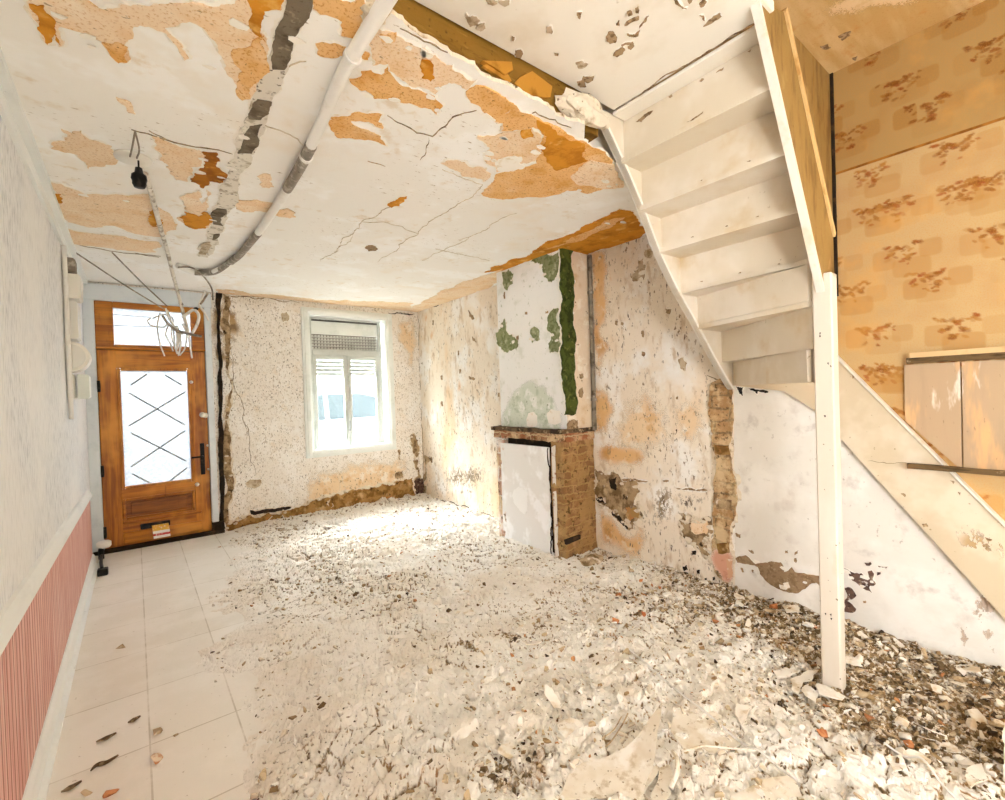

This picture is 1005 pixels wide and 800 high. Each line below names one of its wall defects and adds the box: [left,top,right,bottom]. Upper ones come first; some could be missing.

peeling [23,0,287,110]
peeling [48,128,296,256]
peeling [288,0,366,62]
peeling [328,110,389,147]
crack [320,110,517,261]
peeling [348,26,624,200]
peeling [605,4,649,57]
crack [231,354,256,472]
peeling [215,208,646,531]
damp [501,380,562,429]
peeling [678,379,819,594]
flaking render [843,562,888,613]